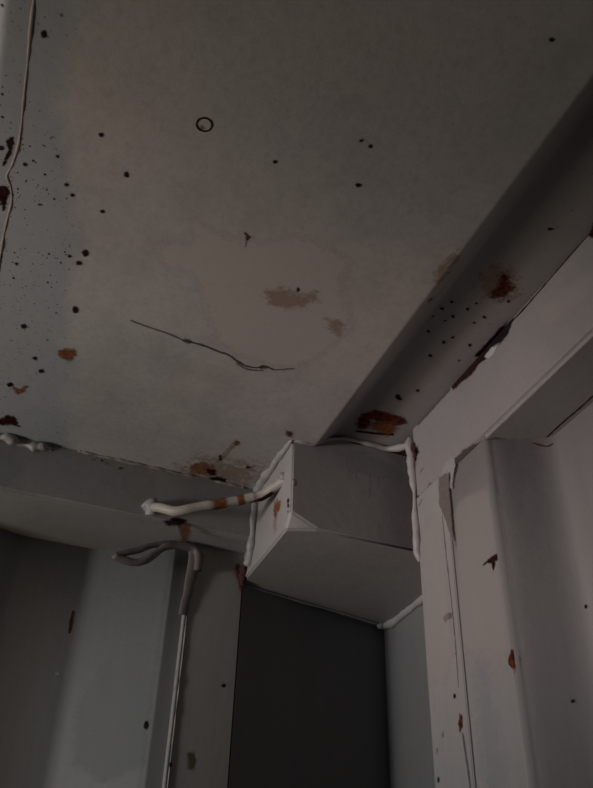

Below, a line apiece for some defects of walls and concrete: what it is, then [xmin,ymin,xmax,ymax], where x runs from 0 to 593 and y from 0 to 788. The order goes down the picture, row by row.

corrosion [2,137,14,166]
corrosion [0,186,10,211]
corrosion [490,272,515,298]
corrosion [57,349,76,360]
crack [182,339,274,370]
peeling [452,318,514,389]
corrosion [0,415,20,427]
corrosion [355,410,406,436]
corrosion [190,455,226,482]
corrosion [508,650,520,669]